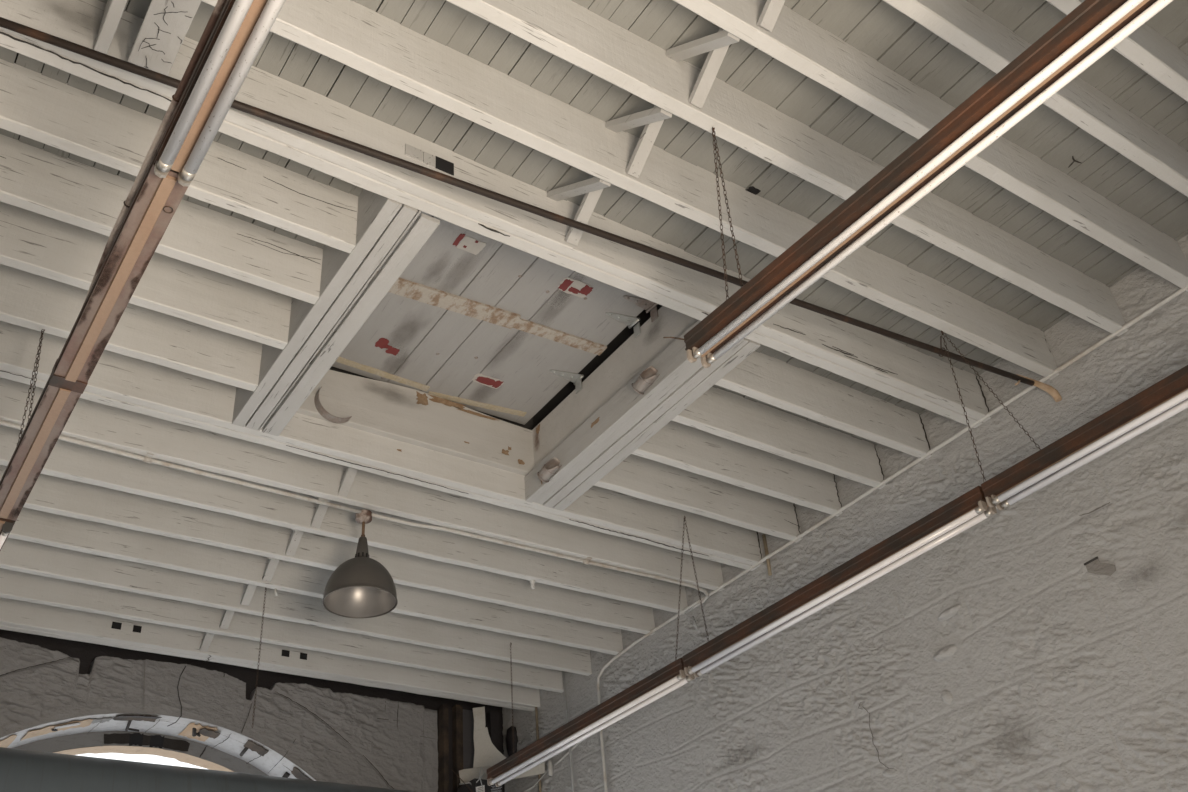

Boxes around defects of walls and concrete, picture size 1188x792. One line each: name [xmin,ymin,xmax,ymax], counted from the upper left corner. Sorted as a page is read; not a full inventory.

crack [0,1,192,102]
peeling [558,279,593,296]
spalling [1084,556,1116,576]